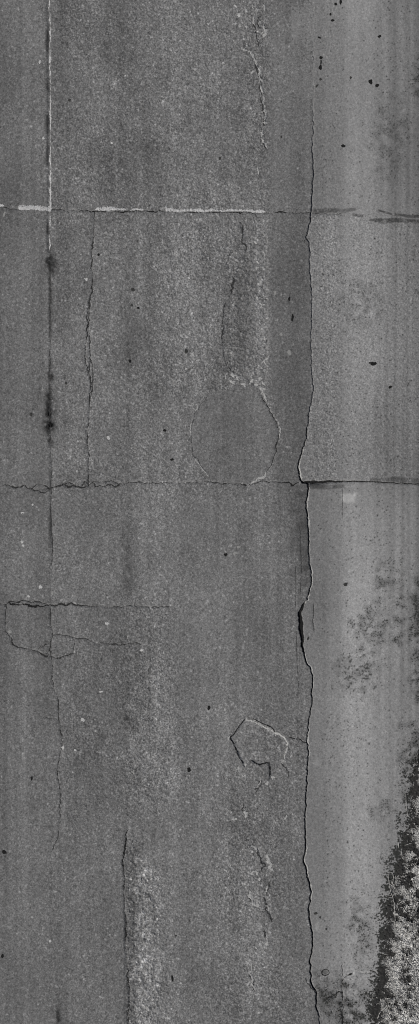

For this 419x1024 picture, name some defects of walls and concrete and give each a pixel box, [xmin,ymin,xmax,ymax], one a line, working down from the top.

crack [3,209,375,1024]
mould [342,570,419,703]
leakage [315,971,366,1024]